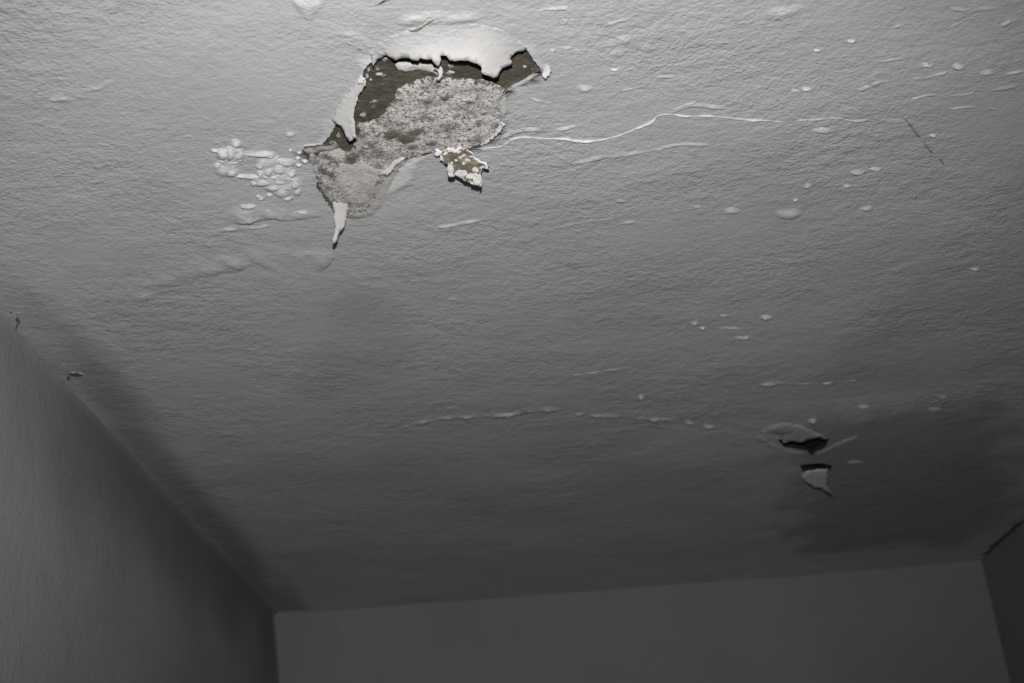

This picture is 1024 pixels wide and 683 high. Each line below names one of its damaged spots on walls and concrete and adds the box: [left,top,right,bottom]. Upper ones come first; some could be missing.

spalling [302,23,552,244]
spalling [754,418,858,494]